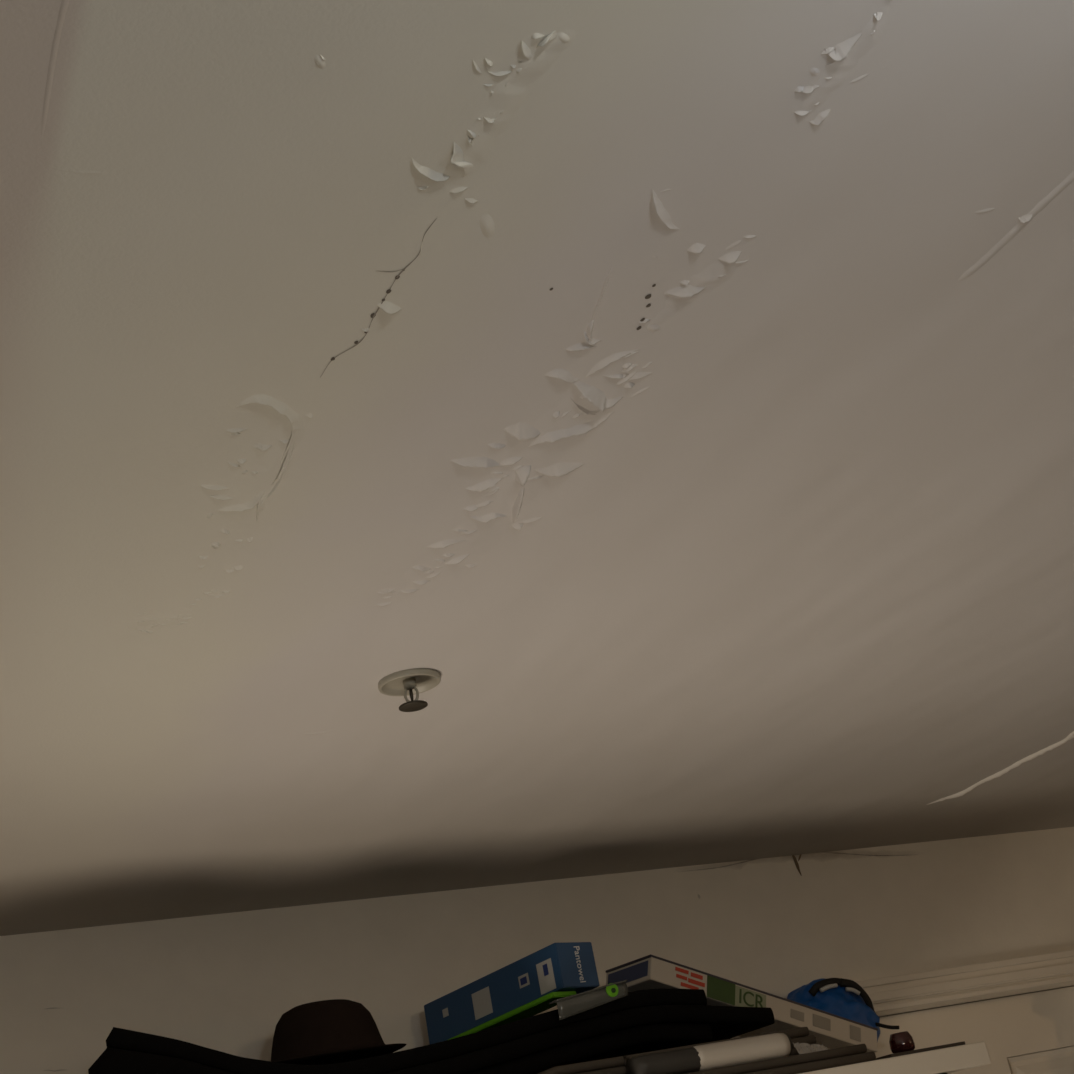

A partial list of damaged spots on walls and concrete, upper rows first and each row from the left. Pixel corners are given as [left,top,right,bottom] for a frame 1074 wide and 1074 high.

peeling [793,0,892,126]
crack [321,218,437,376]
crack [927,731,1074,805]